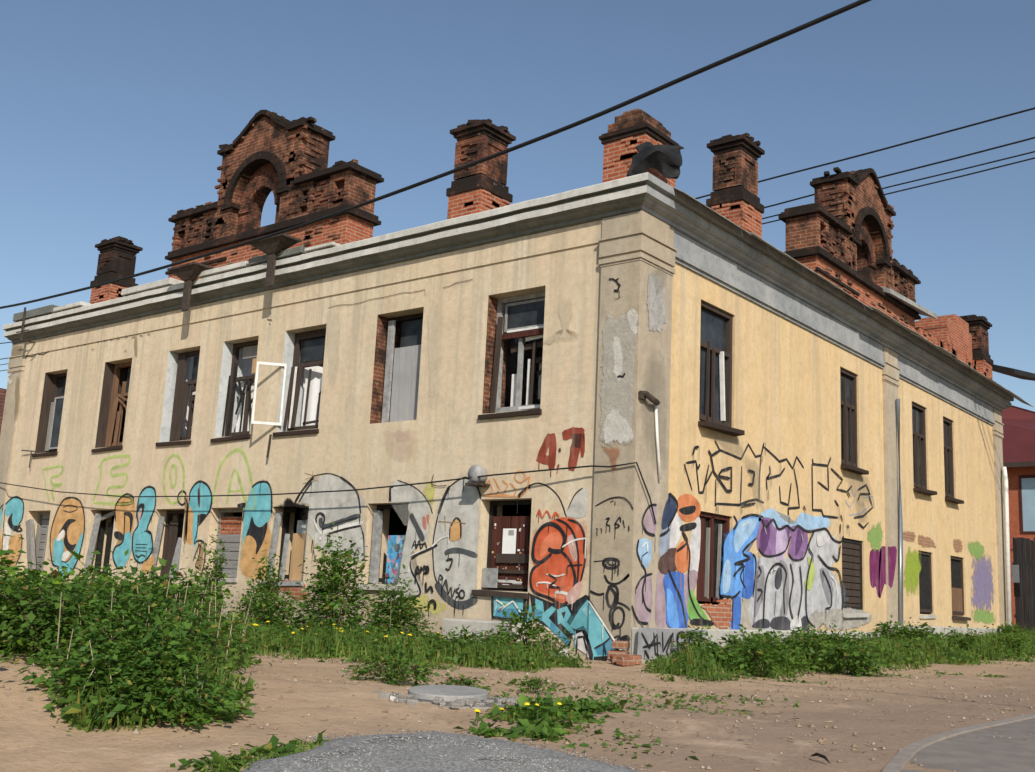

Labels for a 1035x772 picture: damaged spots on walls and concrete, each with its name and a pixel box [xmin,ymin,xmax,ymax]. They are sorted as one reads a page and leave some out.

flaking render [599,272,666,447]